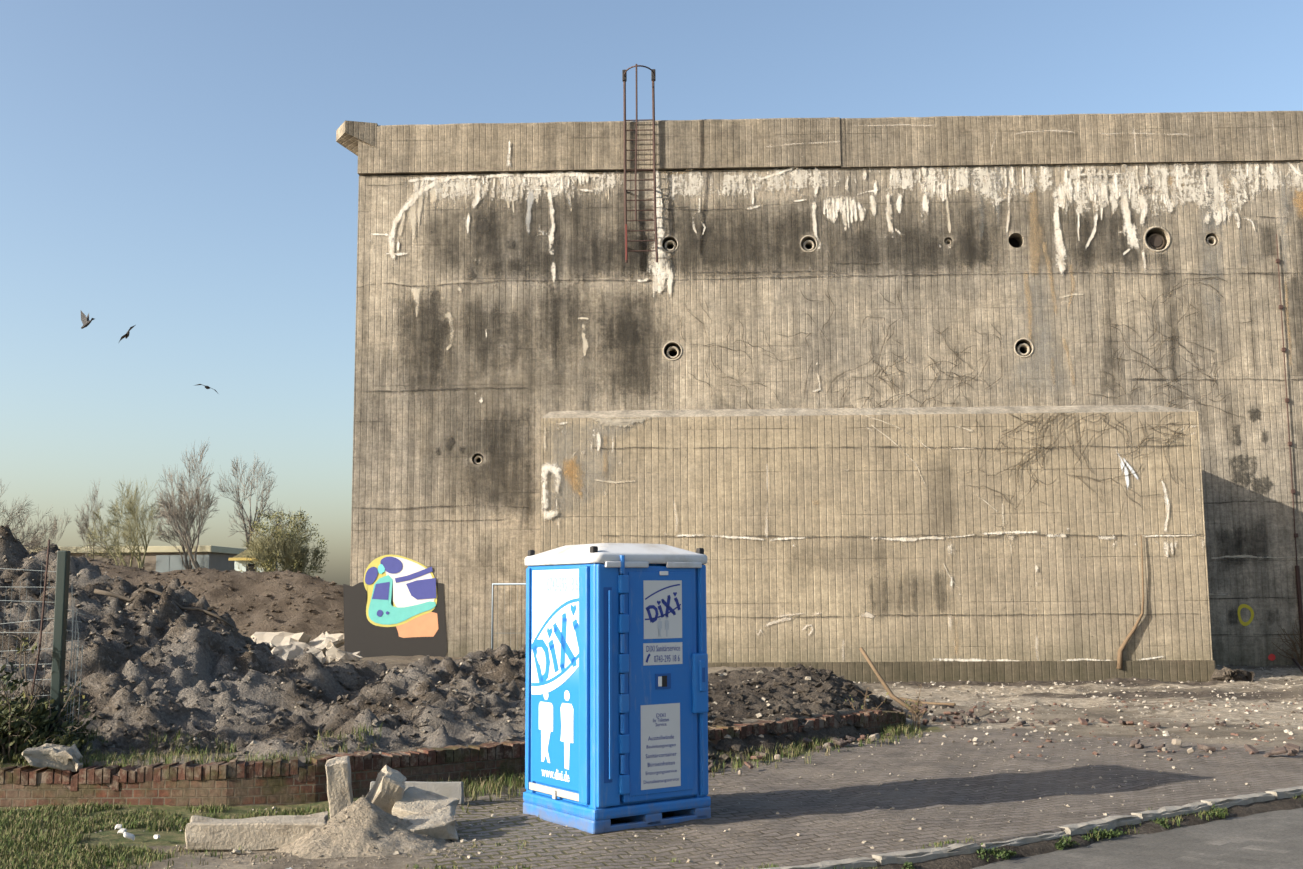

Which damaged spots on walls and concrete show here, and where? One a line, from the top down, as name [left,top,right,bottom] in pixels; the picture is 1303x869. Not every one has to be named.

leakage [370,140,1303,393]
leakage [1231,409,1273,494]